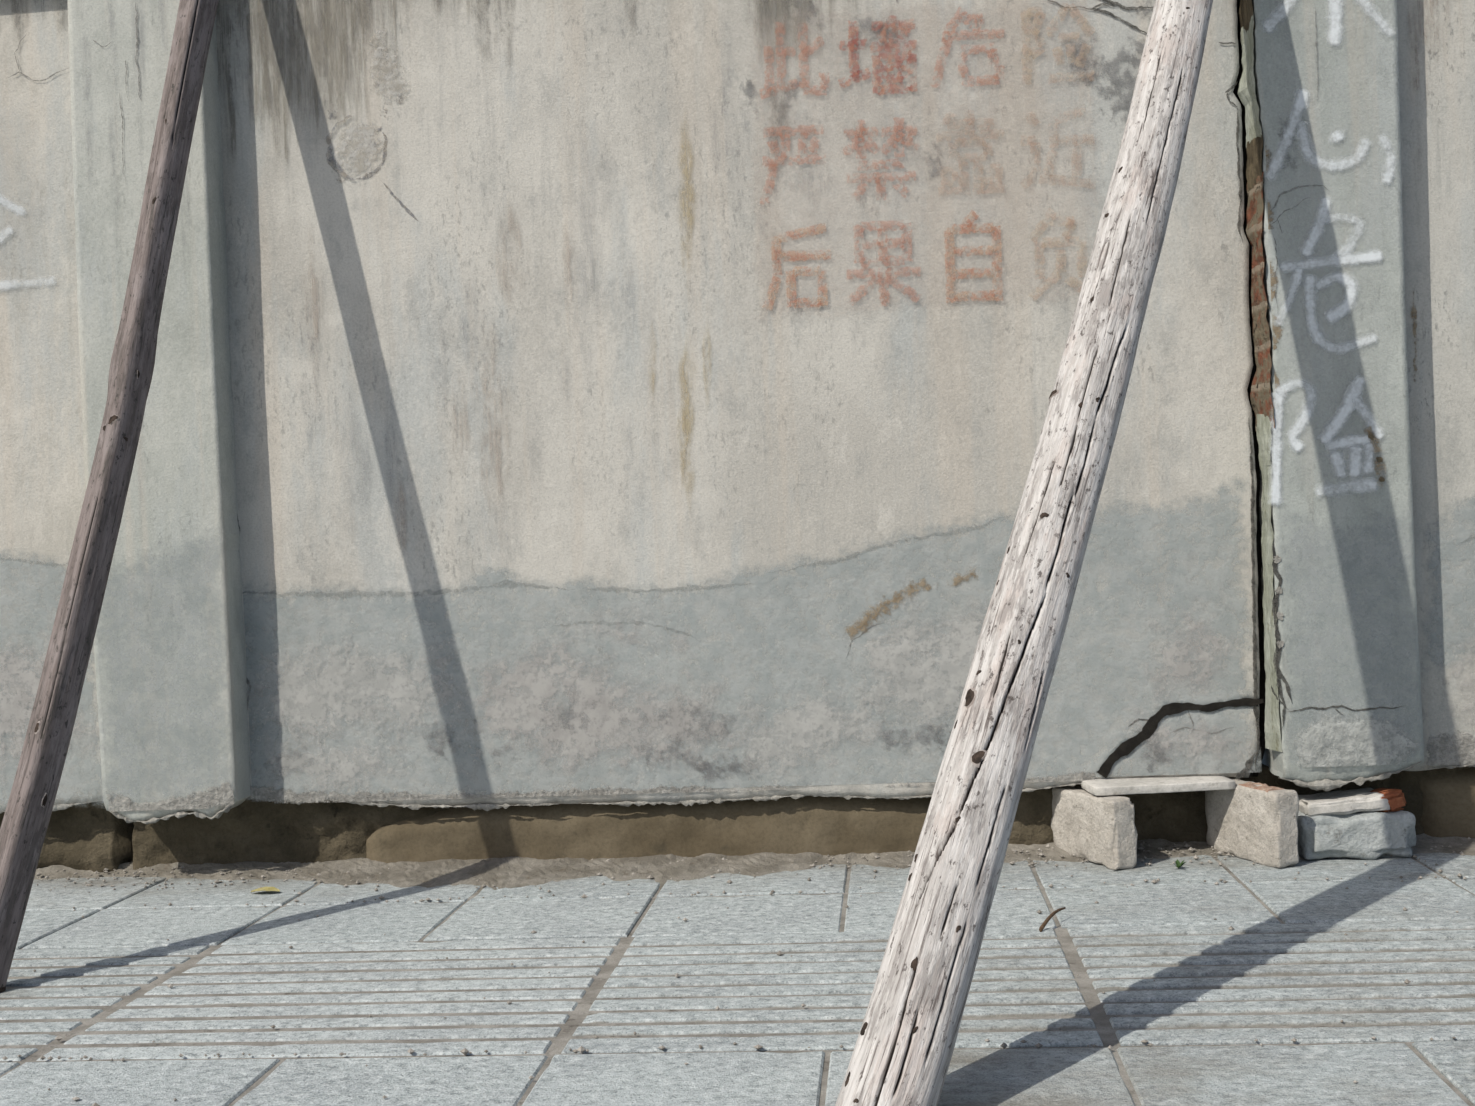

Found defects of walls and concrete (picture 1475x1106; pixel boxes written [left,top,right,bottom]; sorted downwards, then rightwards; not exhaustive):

damp [228,0,360,107]
crack [1048,0,1153,34]
damp [1066,43,1144,112]
crack [1096,0,1402,779]
damp [0,558,66,804]
damp [56,669,101,800]
damp [243,516,1014,796]
rust [846,579,931,637]
damp [1026,487,1261,778]
damp [1429,499,1475,664]